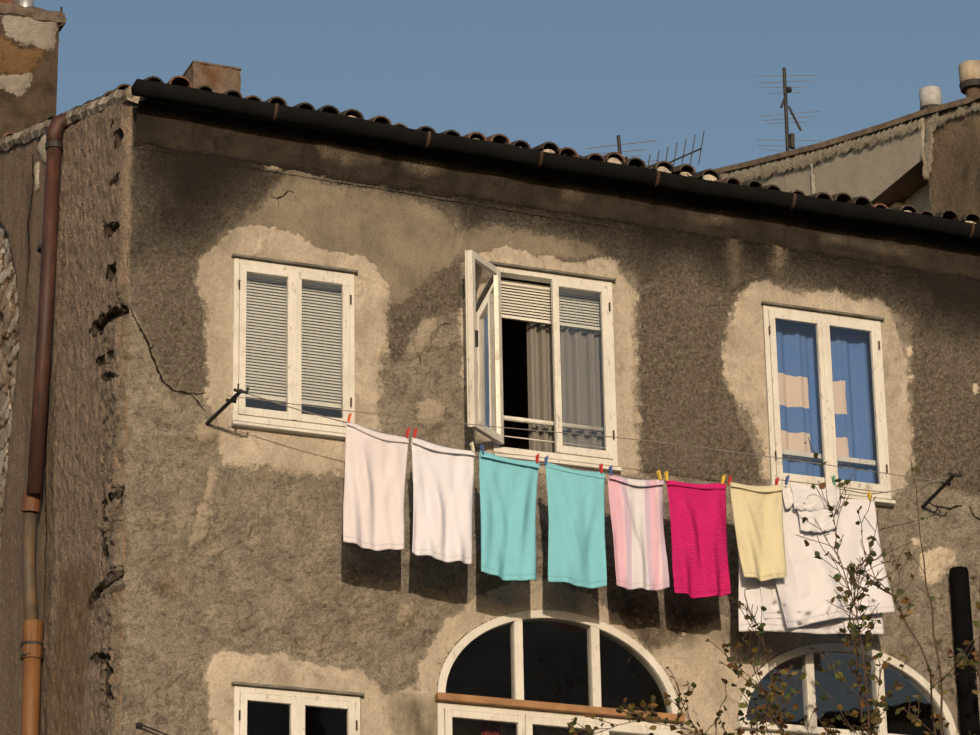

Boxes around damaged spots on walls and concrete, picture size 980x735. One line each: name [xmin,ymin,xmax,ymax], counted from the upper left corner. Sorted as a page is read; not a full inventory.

flaking render [0,35,46,75]
crack [26,154,34,287]
flaking render [0,225,19,563]
crack [129,304,206,412]
spalling [87,262,129,735]